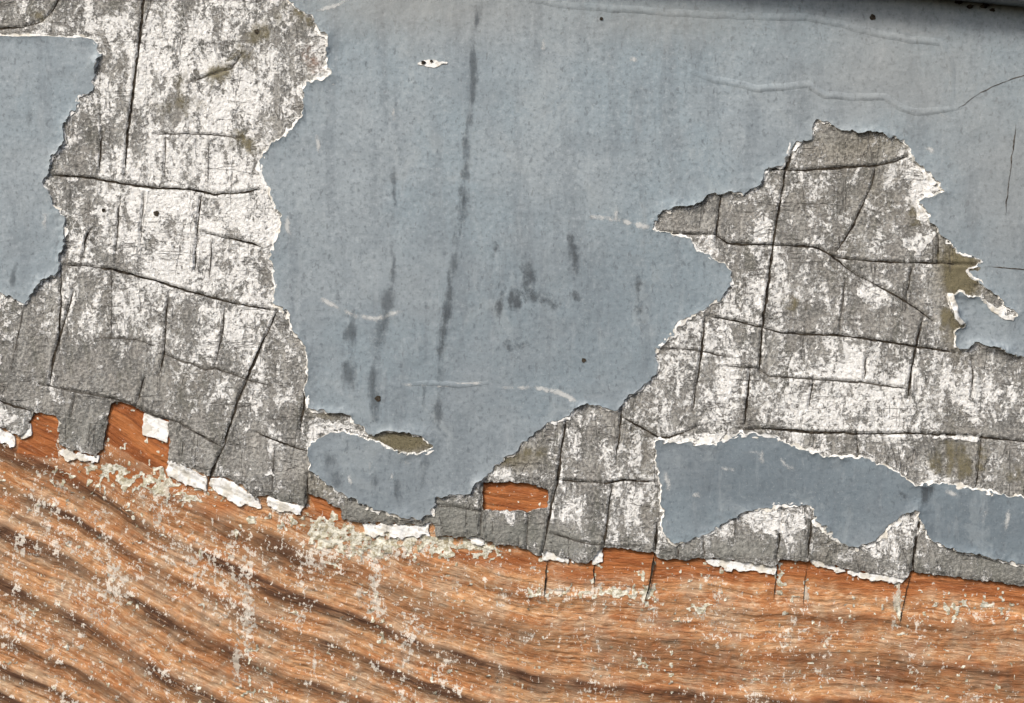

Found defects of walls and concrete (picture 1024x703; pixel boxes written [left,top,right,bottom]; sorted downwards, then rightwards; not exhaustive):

crack [0,0,59,30]
crack [47,0,277,485]
crack [526,153,1024,605]
crack [0,400,30,411]
peeling [216,516,256,559]
peeling [361,584,392,644]
peeling [528,583,572,602]
peeling [578,563,664,611]
peeling [686,584,735,614]
crack [899,522,920,625]
peeling [220,610,298,703]